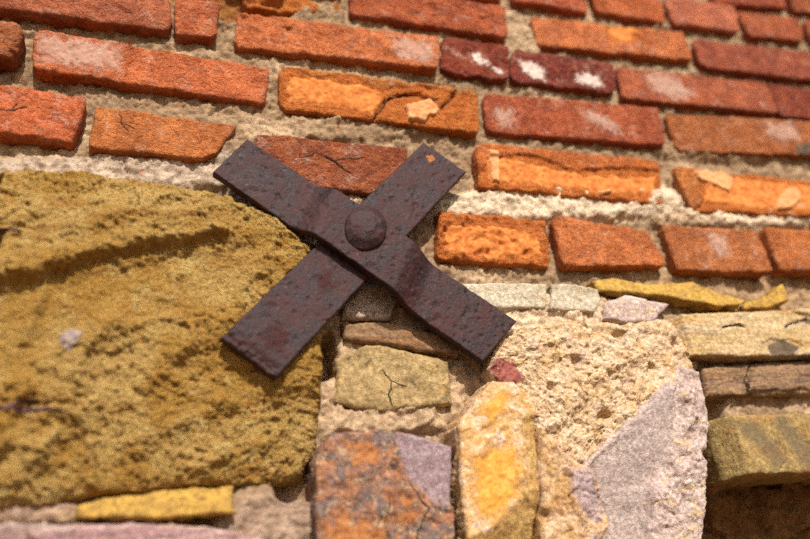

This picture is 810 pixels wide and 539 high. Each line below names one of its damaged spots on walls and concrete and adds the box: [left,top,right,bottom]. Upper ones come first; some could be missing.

damp [517,59,545,82]
damp [576,72,605,87]
crack [0,227,21,235]
crack [0,398,73,413]